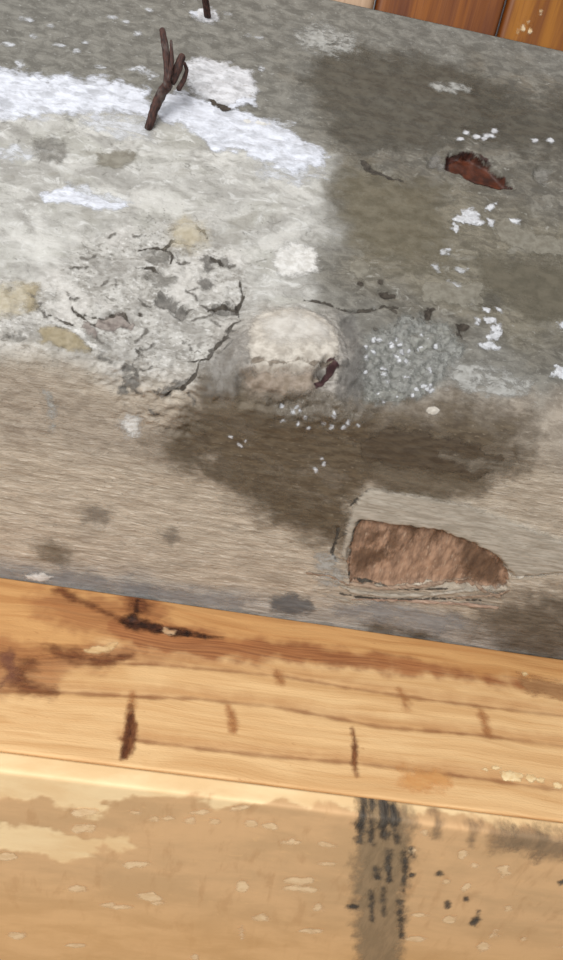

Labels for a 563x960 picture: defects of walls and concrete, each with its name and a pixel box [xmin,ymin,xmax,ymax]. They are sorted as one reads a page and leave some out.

efflorescence [39,182,130,211]
efflorescence [0,68,329,187]
leakage [309,46,563,159]
rust [446,151,490,172]
crack [4,225,245,415]
leakage [167,375,529,546]